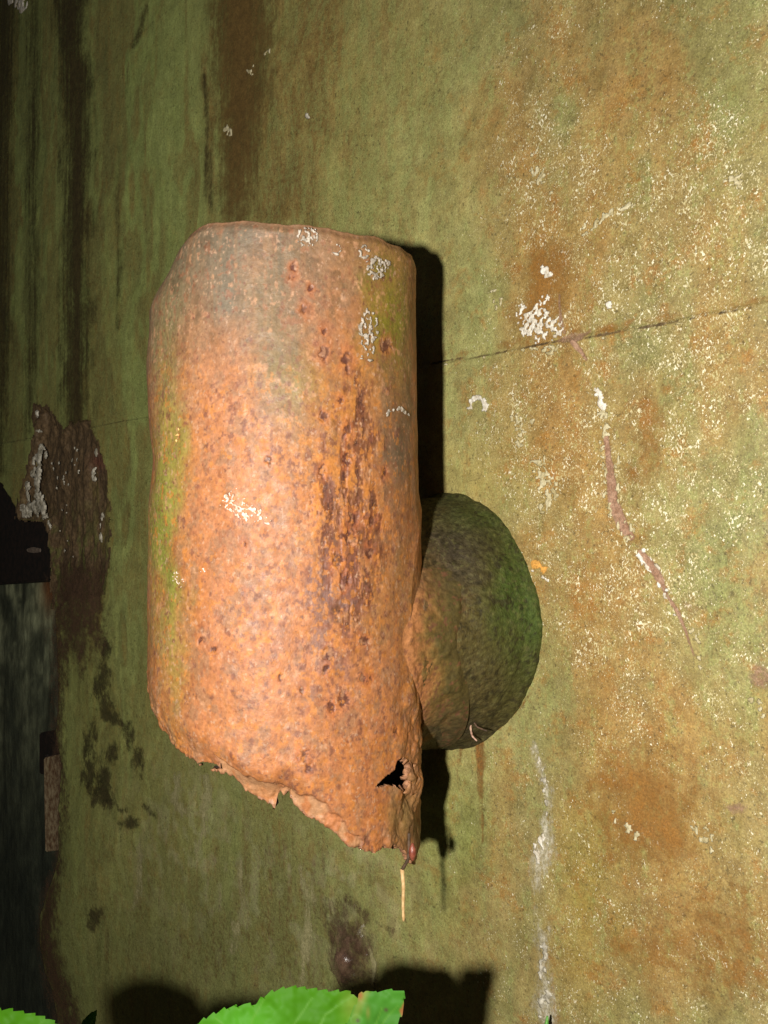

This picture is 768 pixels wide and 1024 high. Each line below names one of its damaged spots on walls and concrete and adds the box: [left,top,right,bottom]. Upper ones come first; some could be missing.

crack [431,295,751,366]
spalling [14,403,144,829]
water stain [532,745,553,883]
water stain [536,930,555,1024]